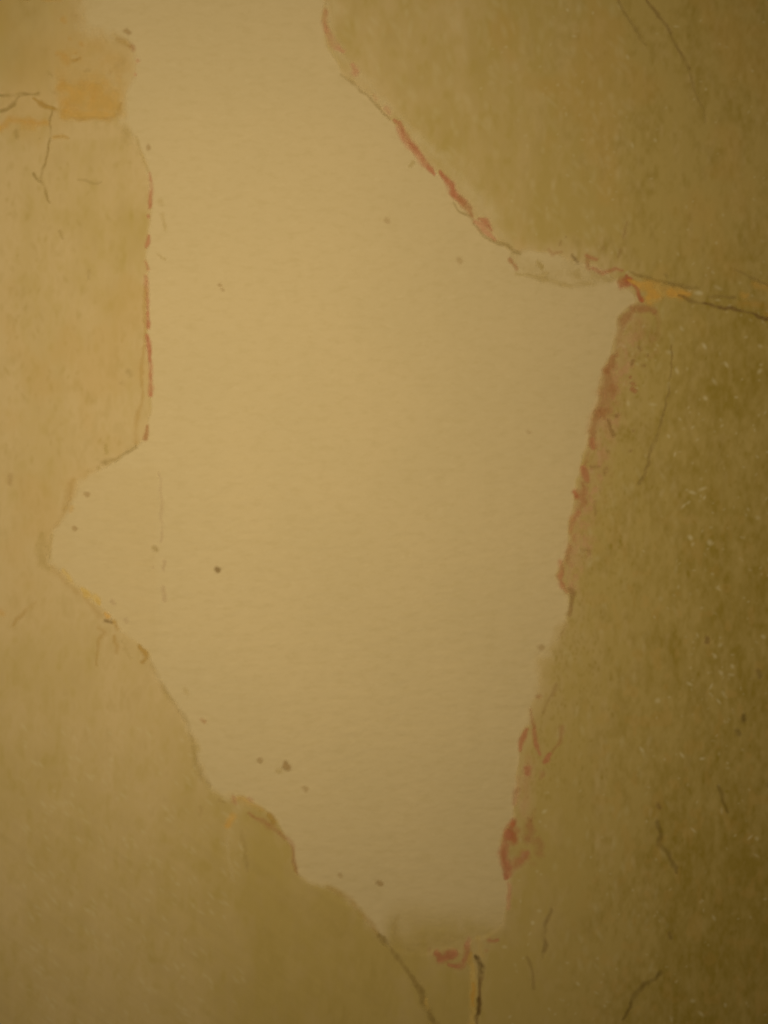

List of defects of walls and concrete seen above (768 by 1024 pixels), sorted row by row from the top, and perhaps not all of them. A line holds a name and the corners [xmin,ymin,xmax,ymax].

crack [0,93,56,203]
crack [631,272,768,321]
peeling [49,0,691,939]